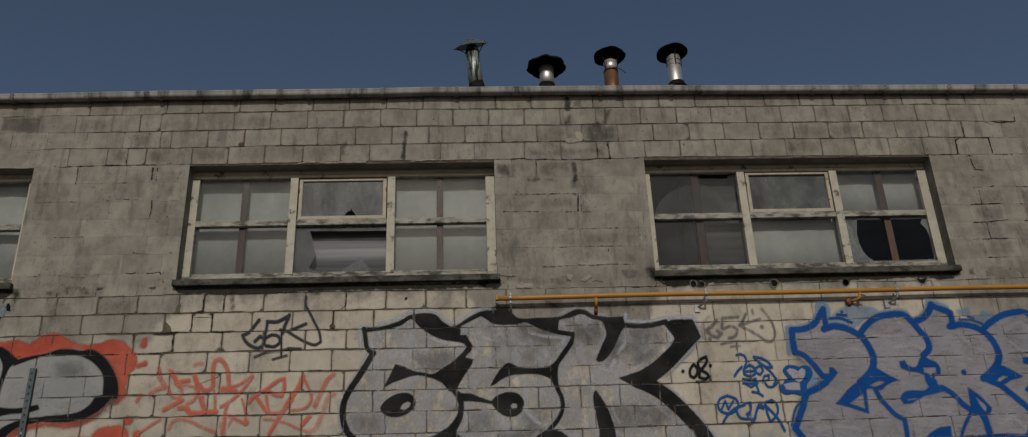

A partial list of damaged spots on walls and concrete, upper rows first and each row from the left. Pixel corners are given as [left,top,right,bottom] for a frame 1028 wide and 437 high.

crack [927,117,1028,278]